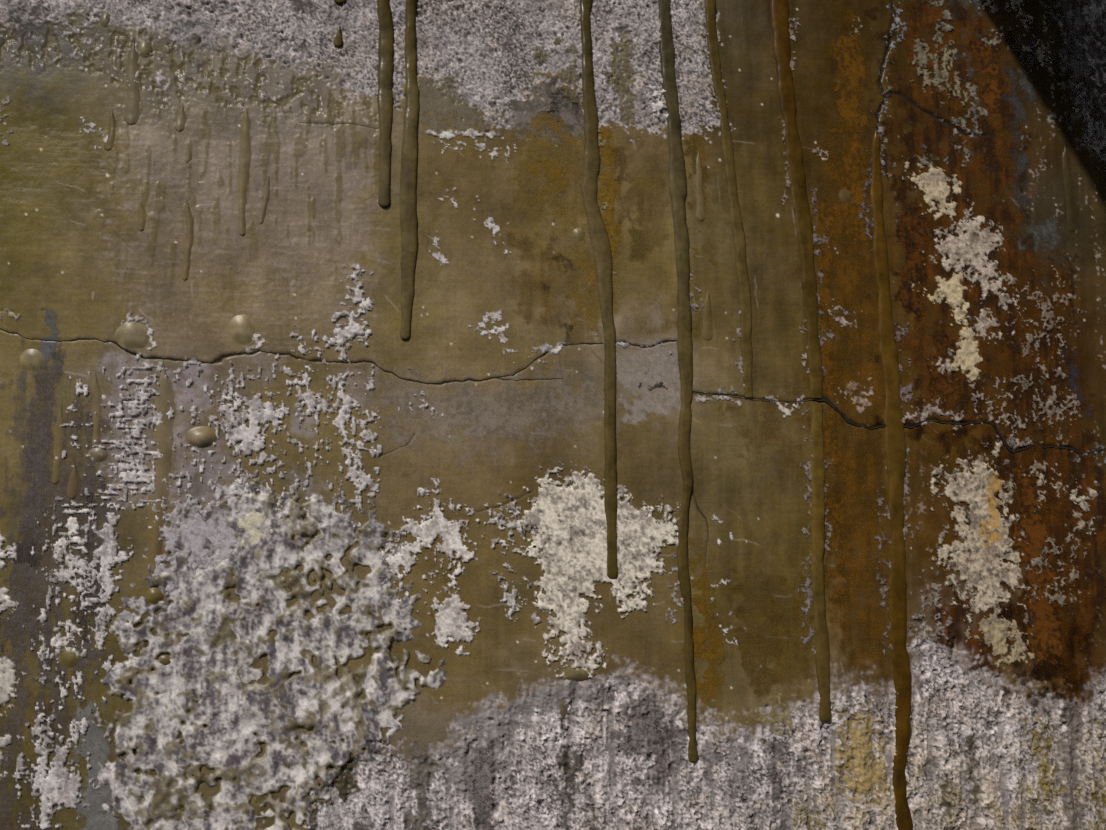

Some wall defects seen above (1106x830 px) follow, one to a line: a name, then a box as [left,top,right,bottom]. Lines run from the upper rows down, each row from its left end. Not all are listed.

leakage [103,40,141,151]
leakage [334,23,343,48]
leakage [237,107,252,236]
crack [0,308,677,384]
leakage [377,0,753,795]
crack [692,386,1106,464]
leakage [755,0,1106,830]
corrosion [865,0,1106,705]
peeling [0,263,382,830]
peeling [370,461,681,678]
leakage [327,753,360,801]
leakage [404,680,606,830]